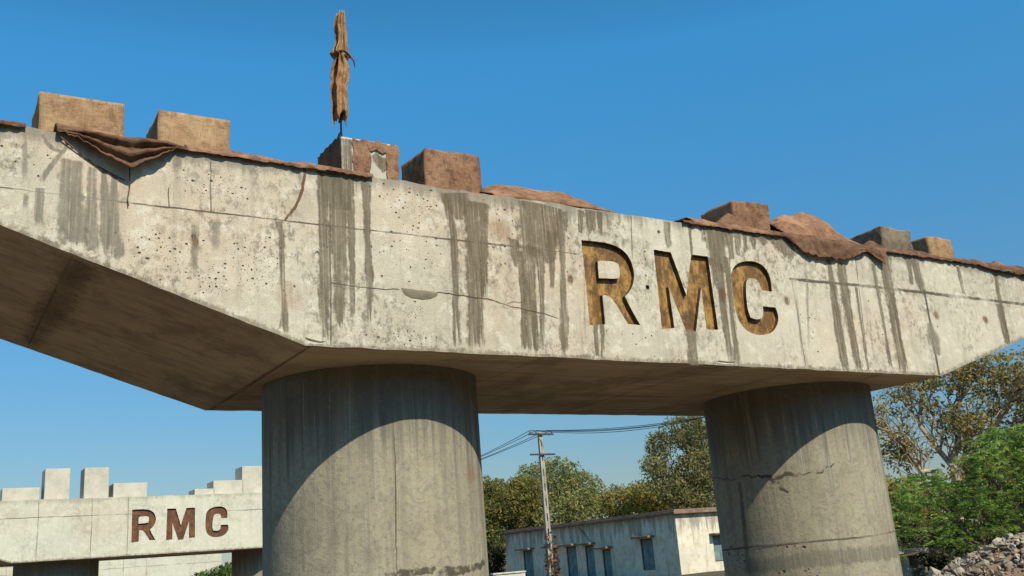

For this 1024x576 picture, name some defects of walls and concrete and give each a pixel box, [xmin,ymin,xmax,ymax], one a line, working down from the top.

damp [23,134,124,258]
crack [284,168,306,220]
damp [316,139,374,336]
damp [441,193,489,345]
crack [437,292,556,318]
damp [510,200,603,352]
damp [827,260,869,369]
damp [871,257,907,371]
damp [907,257,926,295]
damp [927,323,940,355]
crack [713,463,834,493]